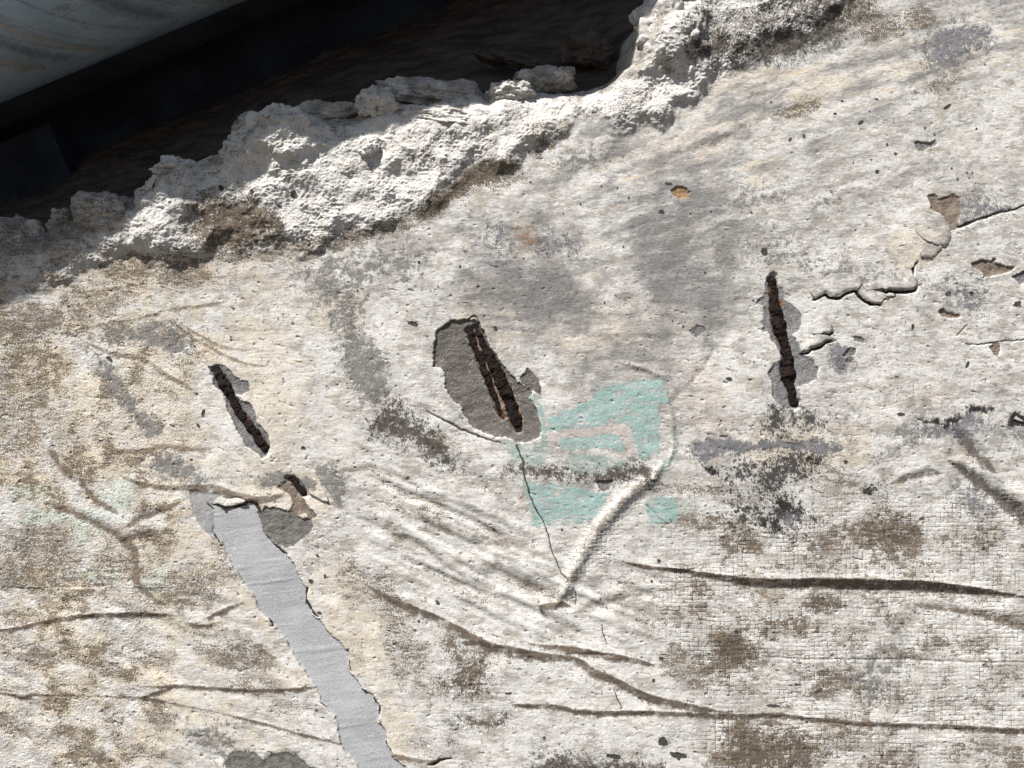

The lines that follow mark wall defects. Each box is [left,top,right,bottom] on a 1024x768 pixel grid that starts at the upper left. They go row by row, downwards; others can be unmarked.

spalling [665,182,690,199]
peeling [811,194,961,304]
spalling [971,258,1024,285]
spalling [752,276,835,409]
spalling [208,364,270,459]
spalling [433,319,542,443]
spalling [189,490,246,537]
spalling [257,477,328,548]
spalling [224,749,315,768]